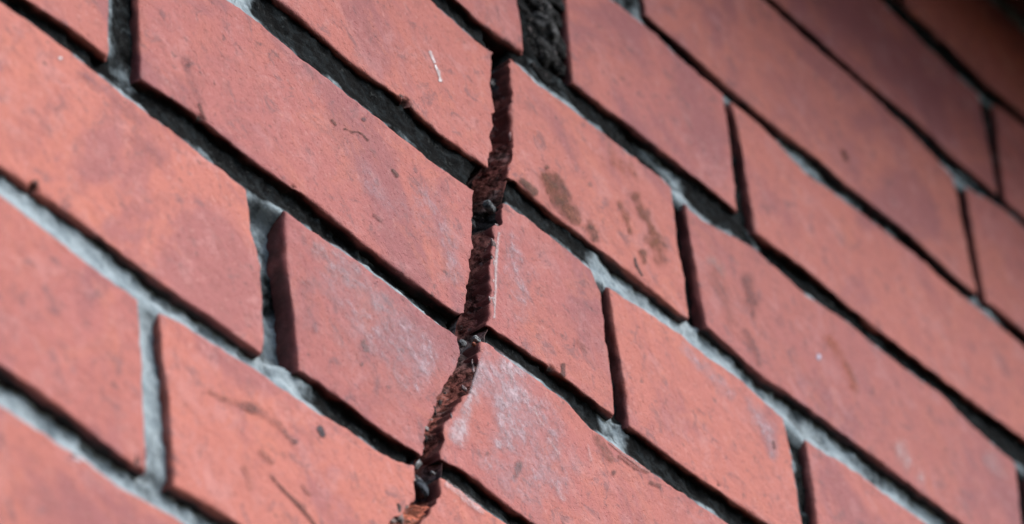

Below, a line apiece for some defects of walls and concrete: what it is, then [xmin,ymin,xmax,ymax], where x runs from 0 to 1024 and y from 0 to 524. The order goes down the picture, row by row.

crack [389,47,511,524]